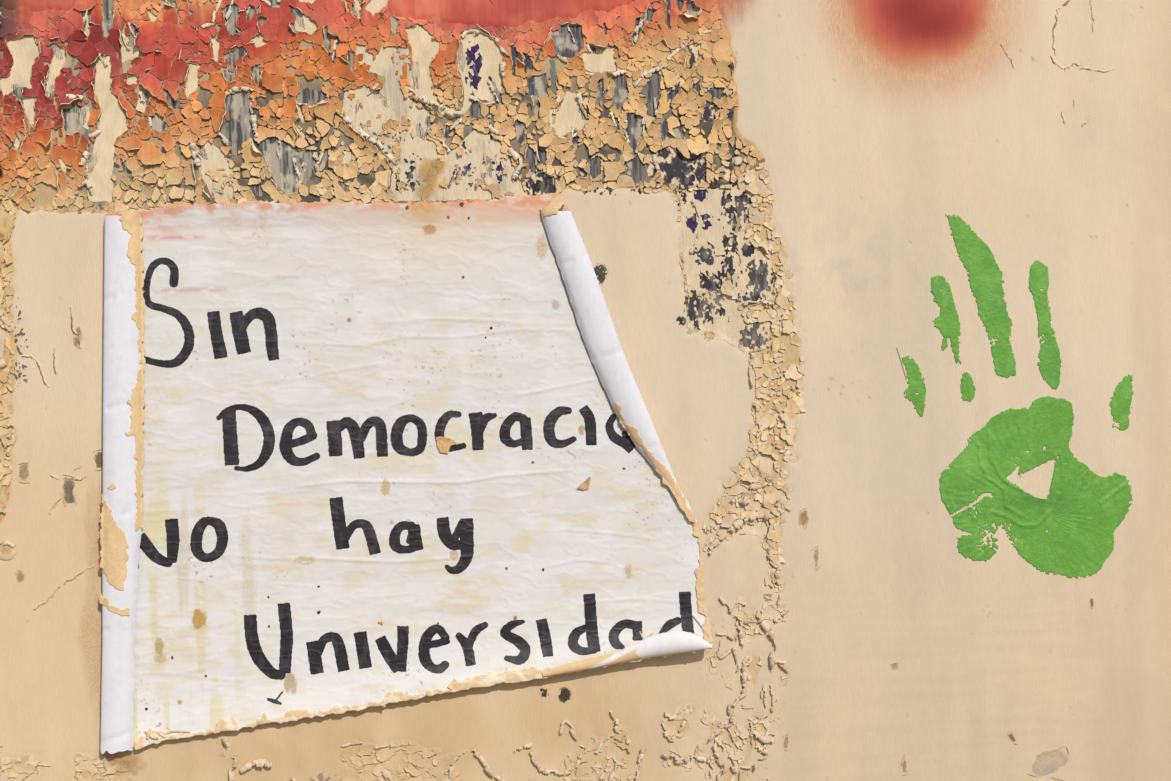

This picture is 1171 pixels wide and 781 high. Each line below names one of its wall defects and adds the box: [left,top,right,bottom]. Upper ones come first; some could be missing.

peeling [0,0,809,781]
crack [1050,0,1114,73]